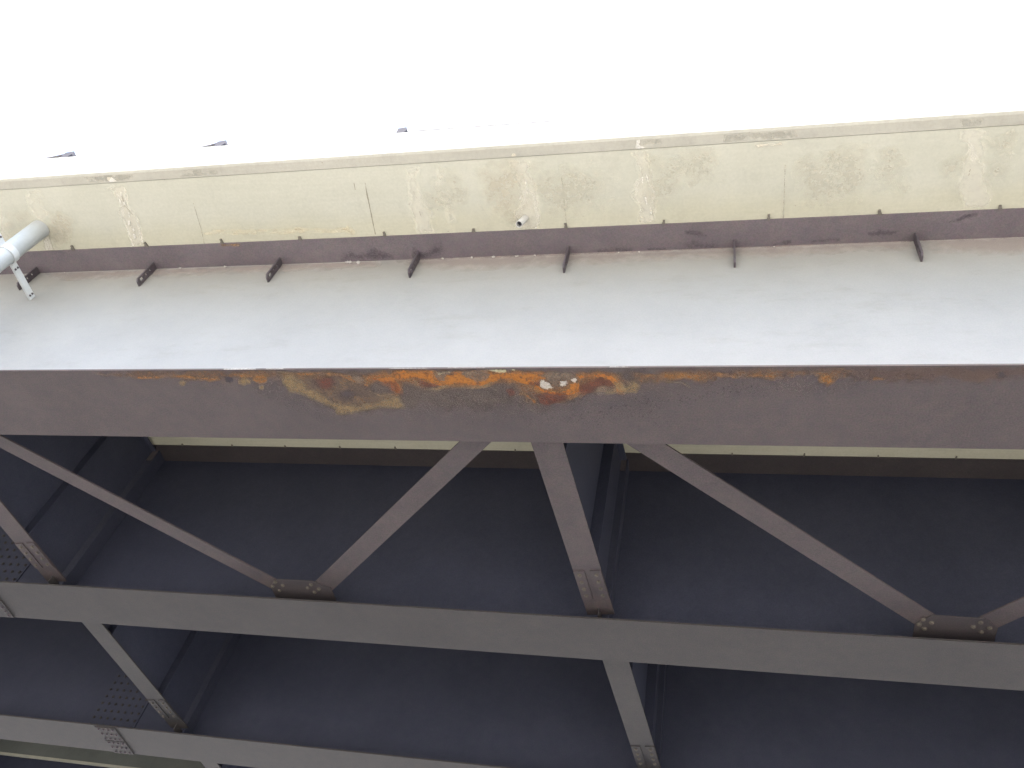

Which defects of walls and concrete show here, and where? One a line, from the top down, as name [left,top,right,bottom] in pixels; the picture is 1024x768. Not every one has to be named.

peeling [540,378,577,390]
rust [110,367,1024,414]